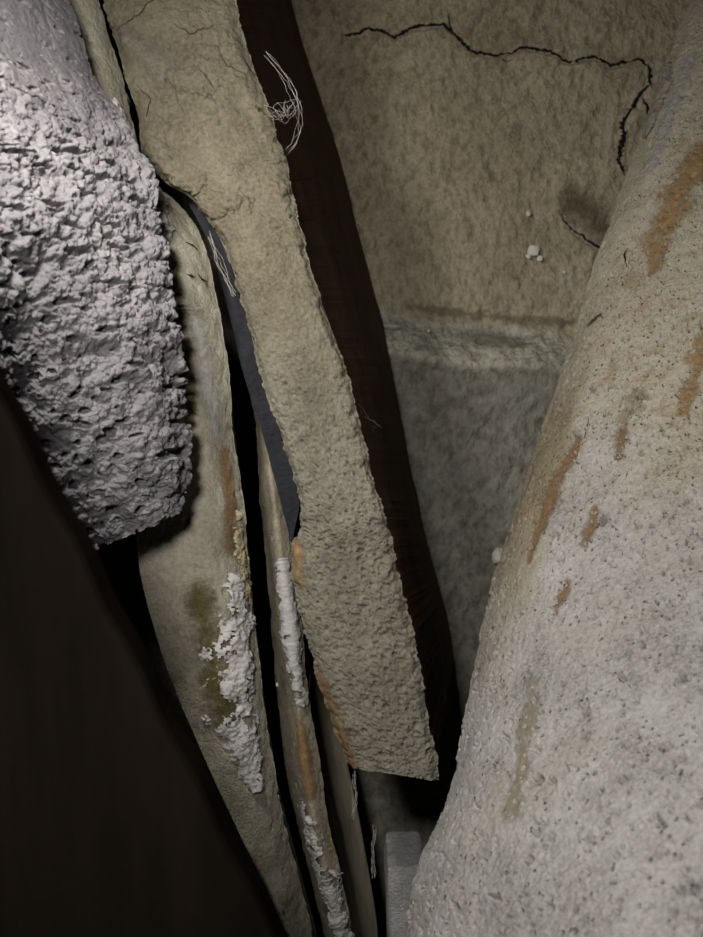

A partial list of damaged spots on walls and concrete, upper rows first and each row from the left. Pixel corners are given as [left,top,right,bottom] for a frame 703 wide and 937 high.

crack [343,14,653,176]
rust [644,143,703,274]
rust [527,435,582,563]
water stain [185,584,241,727]